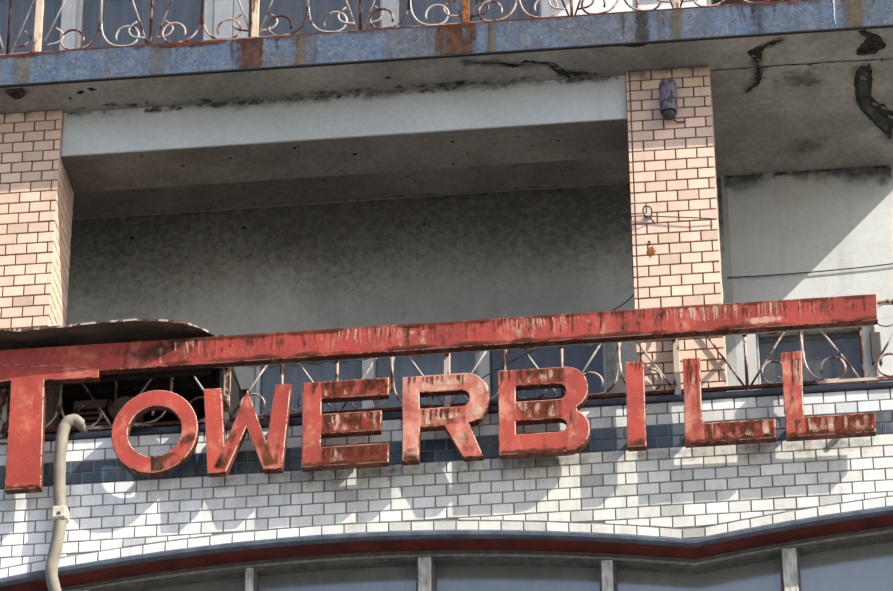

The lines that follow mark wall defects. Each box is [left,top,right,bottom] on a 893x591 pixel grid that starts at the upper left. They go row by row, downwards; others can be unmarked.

corrosion [0,50,65,58]
corrosion [136,35,294,68]
leakage [197,85,403,107]
corrosion [431,23,476,55]
leakage [419,77,526,93]
crack [464,60,582,79]
crack [712,38,886,92]
flaking render [854,30,893,139]
leakage [775,165,892,183]
leakage [717,173,763,224]